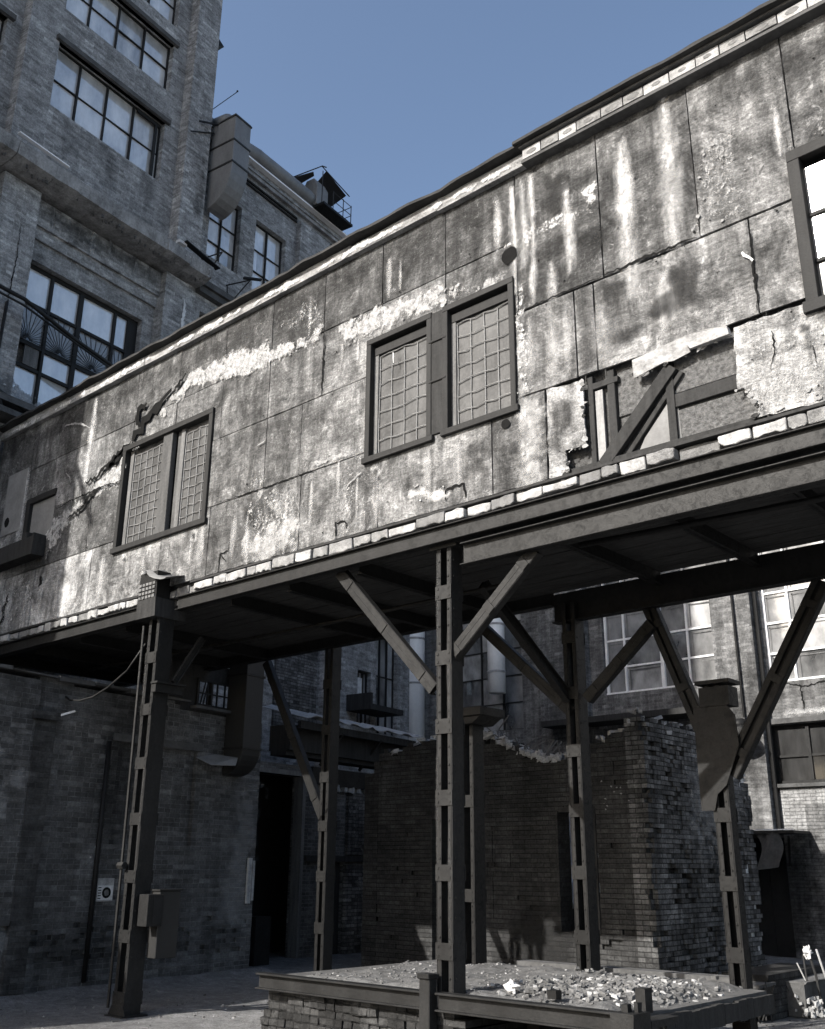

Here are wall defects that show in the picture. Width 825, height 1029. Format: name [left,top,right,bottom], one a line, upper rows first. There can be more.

water stain [619,167,629,218]
peeling [168,278,299,350]
peeling [321,224,401,269]
spalling [338,276,504,346]
water stain [585,324,639,343]
water stain [603,281,623,314]
water stain [649,258,706,318]
crack [749,232,759,310]
spalling [160,313,323,417]
spalling [91,456,126,496]
crack [57,373,186,520]
crack [787,680,825,714]